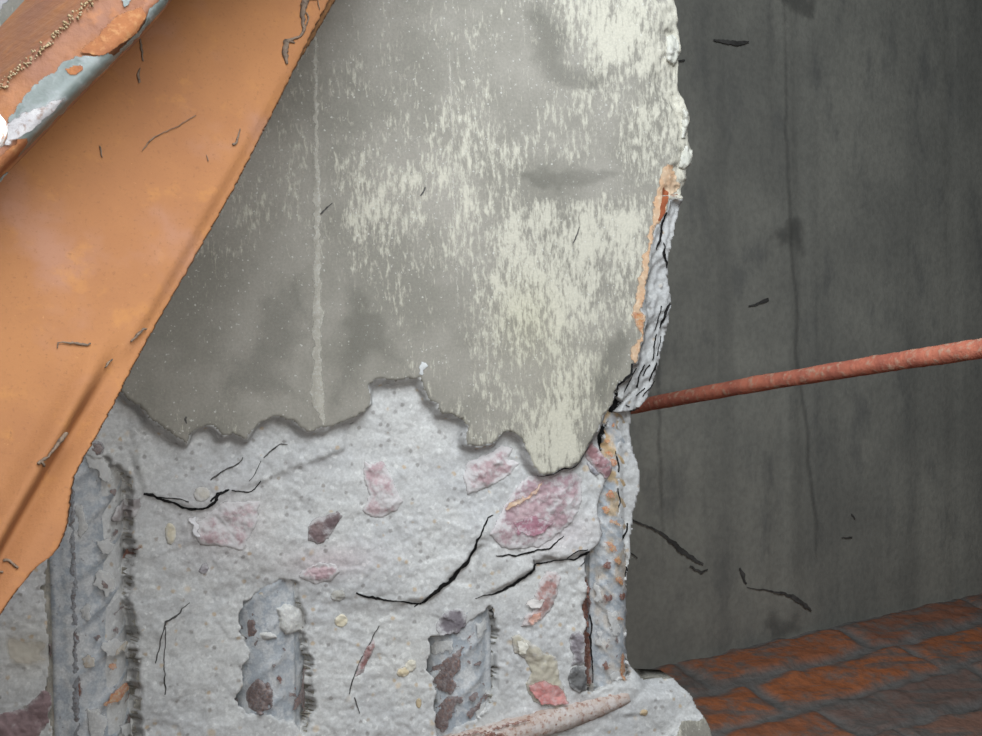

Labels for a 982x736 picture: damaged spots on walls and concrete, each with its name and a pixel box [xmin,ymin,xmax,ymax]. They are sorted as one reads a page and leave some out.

corrosion [81,6,146,56]
corrosion [631,164,680,363]
crack [656,212,668,268]
crack [143,443,288,511]
spalling [94,198,703,736]
crack [536,303,708,577]
crack [356,515,590,619]
spalling [0,558,50,714]
spalling [40,706,53,736]
corrosion [236,664,282,715]
corrosion [430,636,489,732]
corrosion [582,579,625,687]